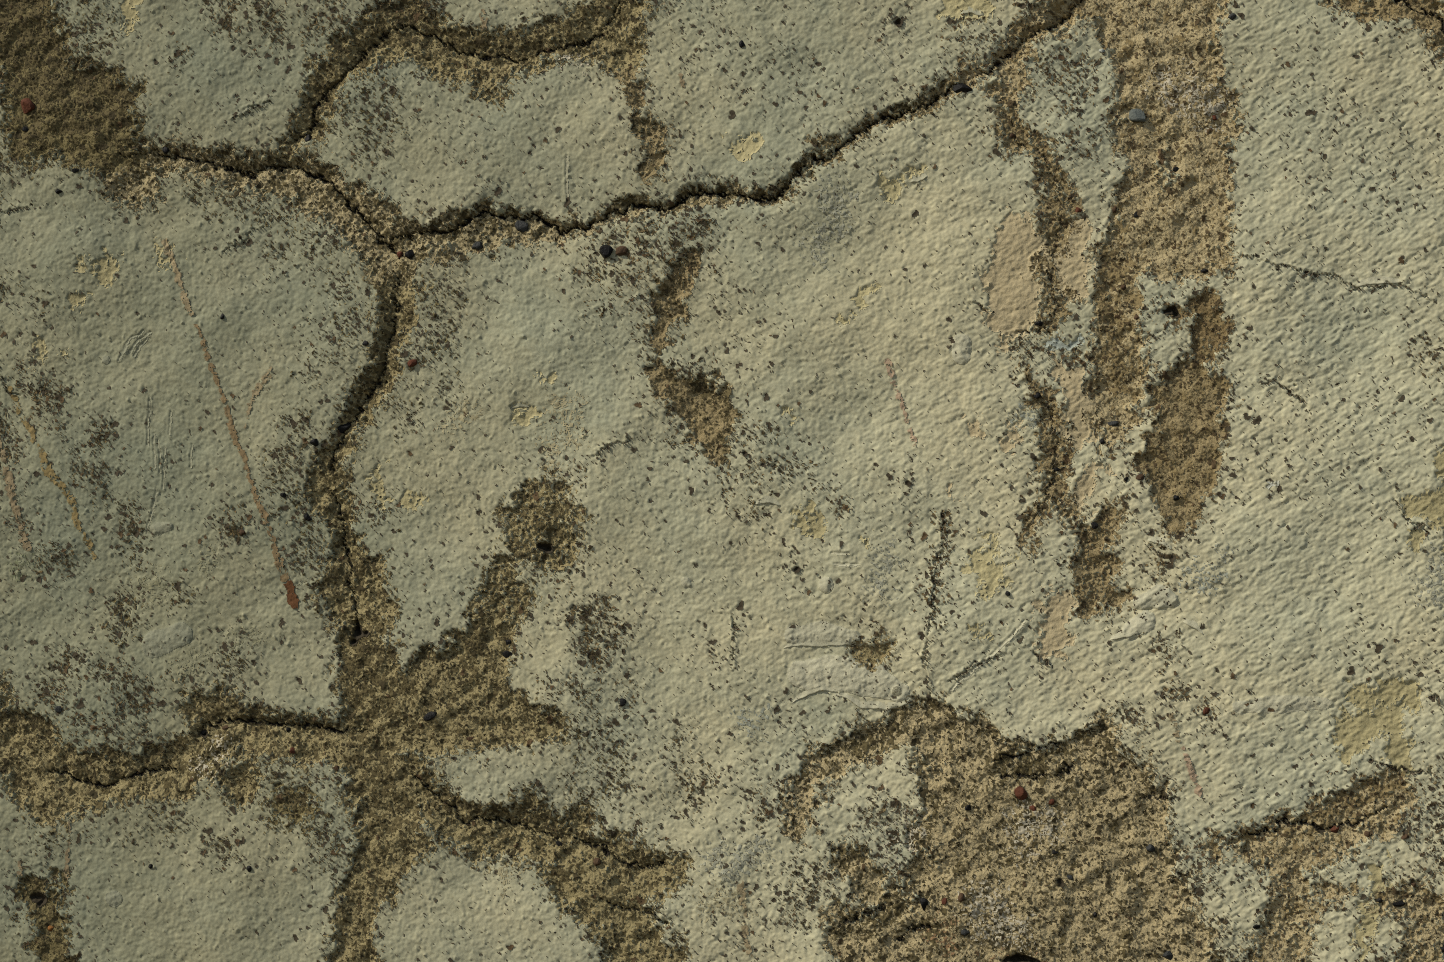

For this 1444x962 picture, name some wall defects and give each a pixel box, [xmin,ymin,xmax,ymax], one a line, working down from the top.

crack [981,0,1083,75]
crack [1394,0,1444,33]
crack [141,21,950,625]
crack [1028,380,1059,522]
crack [48,765,177,787]
crack [204,718,361,734]
peeling [648,725,730,826]
spalling [740,677,1444,962]